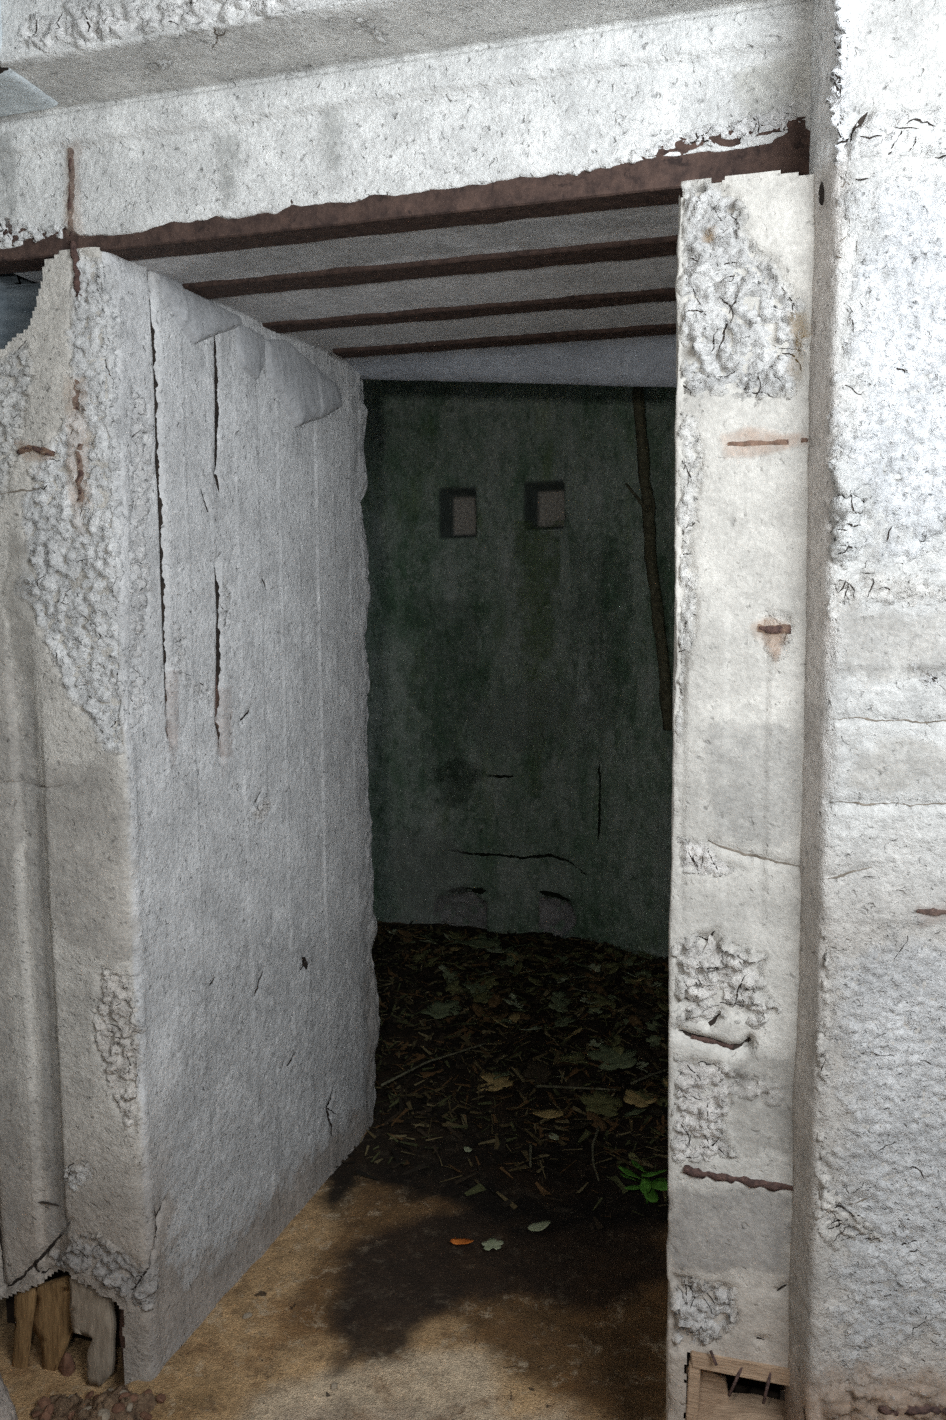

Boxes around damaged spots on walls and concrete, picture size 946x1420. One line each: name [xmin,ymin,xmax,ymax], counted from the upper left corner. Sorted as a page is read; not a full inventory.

corrosion [67,148,82,297]
crack [0,487,42,495]
corrosion [16,445,55,456]
corrosion [75,443,85,502]
crack [147,271,168,740]
crack [201,335,219,512]
corrosion [728,438,808,447]
corrosion [758,624,791,634]
crack [214,567,249,760]
corrosion [683,1165,794,1192]
crack [0,1220,72,1288]
spalling [48,1231,160,1312]